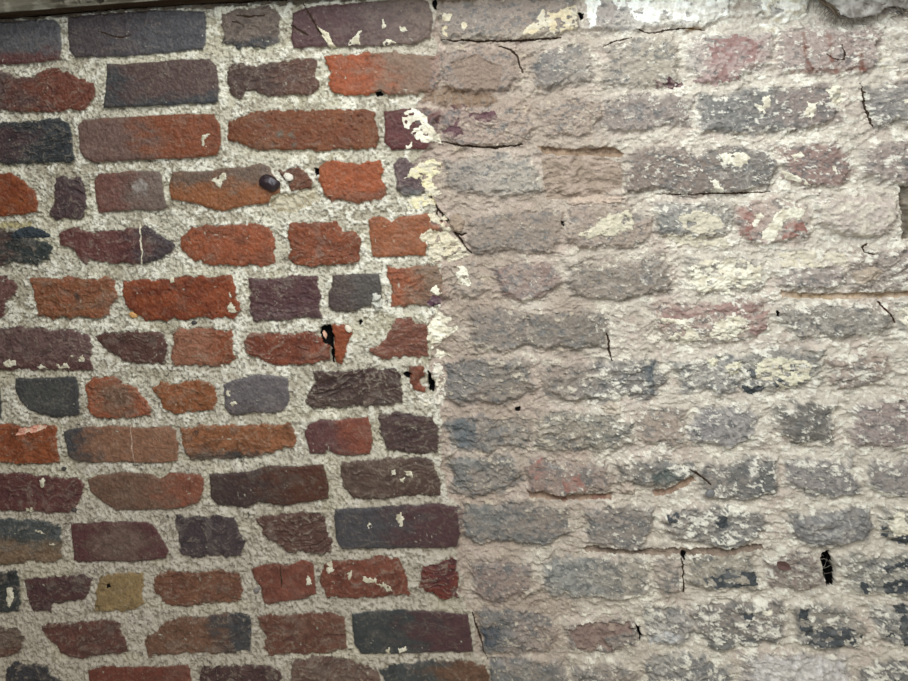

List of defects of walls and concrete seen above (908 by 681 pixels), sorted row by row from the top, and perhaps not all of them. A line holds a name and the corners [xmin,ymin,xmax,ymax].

crack [440,37,561,73]
peeling [402,53,503,149]
crack [859,83,873,127]